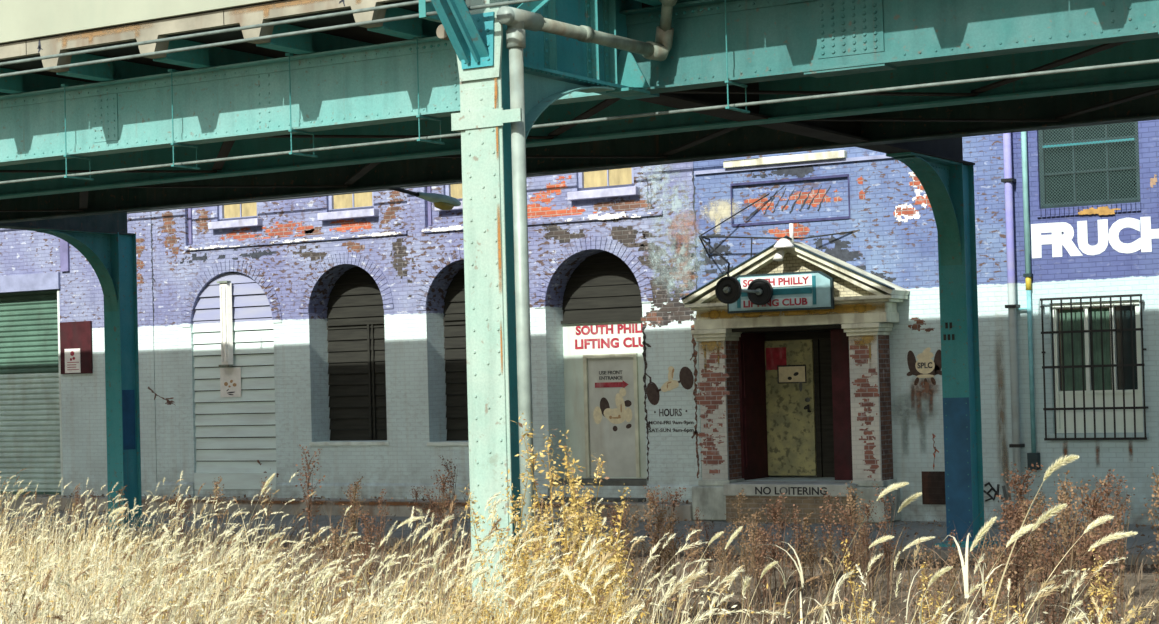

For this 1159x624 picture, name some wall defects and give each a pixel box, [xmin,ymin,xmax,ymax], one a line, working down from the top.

rust [63,25,139,47]
rust [248,0,322,16]
peeling [161,190,415,297]
spalling [527,175,742,327]
spalling [893,172,931,222]
peeling [695,347,730,475]
peeling [849,340,880,481]
rust [912,379,935,416]